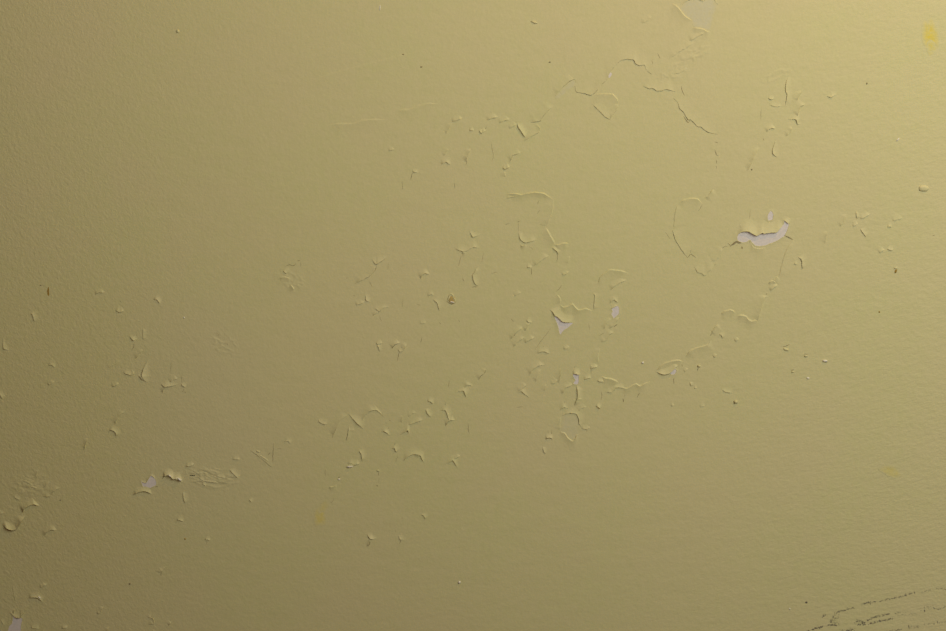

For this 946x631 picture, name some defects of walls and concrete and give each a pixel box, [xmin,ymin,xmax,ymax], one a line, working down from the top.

peeling [694,207,793,276]